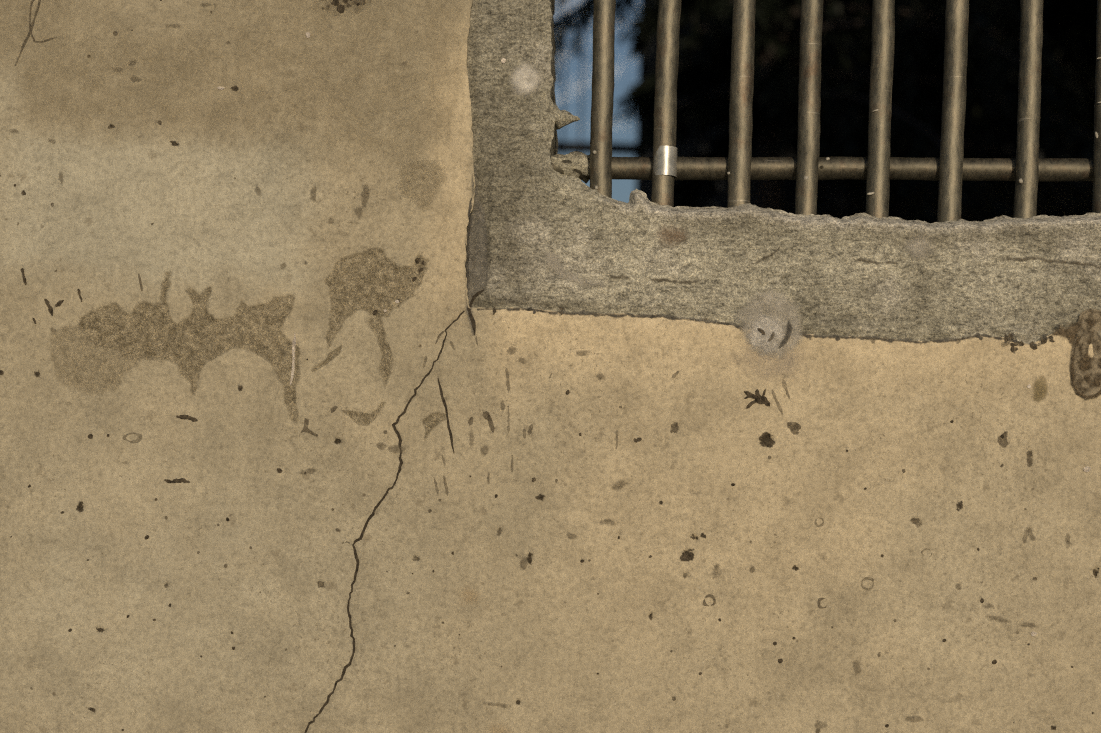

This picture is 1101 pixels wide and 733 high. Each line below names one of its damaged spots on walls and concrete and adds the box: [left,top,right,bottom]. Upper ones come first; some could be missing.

spalling [322,0,365,13]
flaking render [52,273,318,437]
flaking render [331,402,385,426]
flaking render [312,248,427,383]
crack [304,197,485,733]